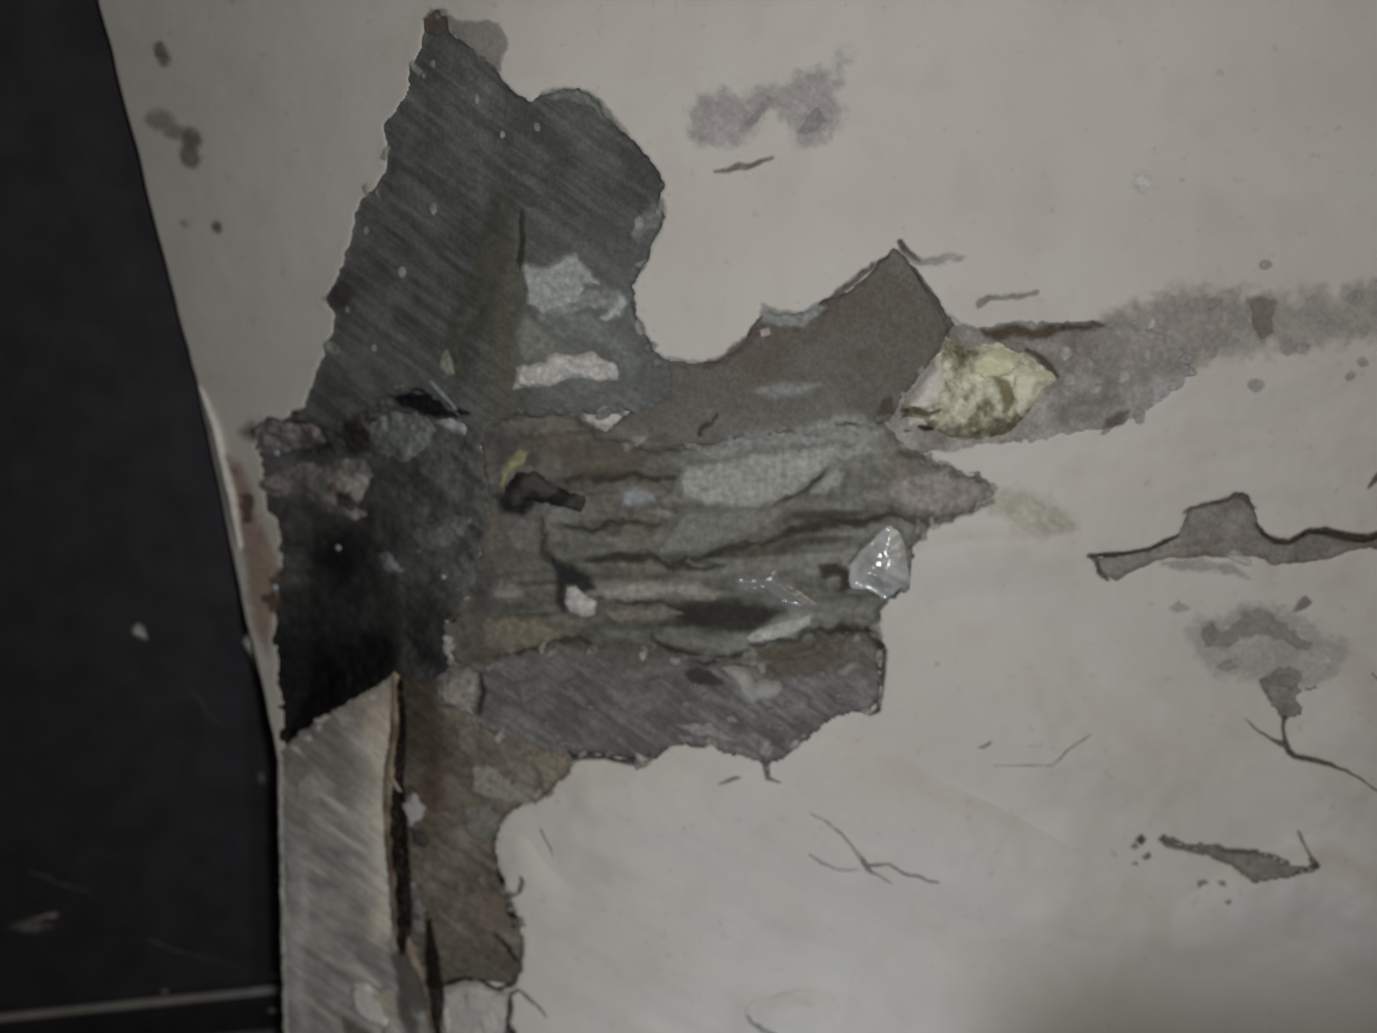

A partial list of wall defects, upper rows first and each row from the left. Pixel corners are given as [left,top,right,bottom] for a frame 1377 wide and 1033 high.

leakage [692,72,838,145]
leakage [715,157,773,172]
flaking render [242,9,1196,1033]
crack [1248,716,1377,791]
flaking render [1132,831,1320,904]